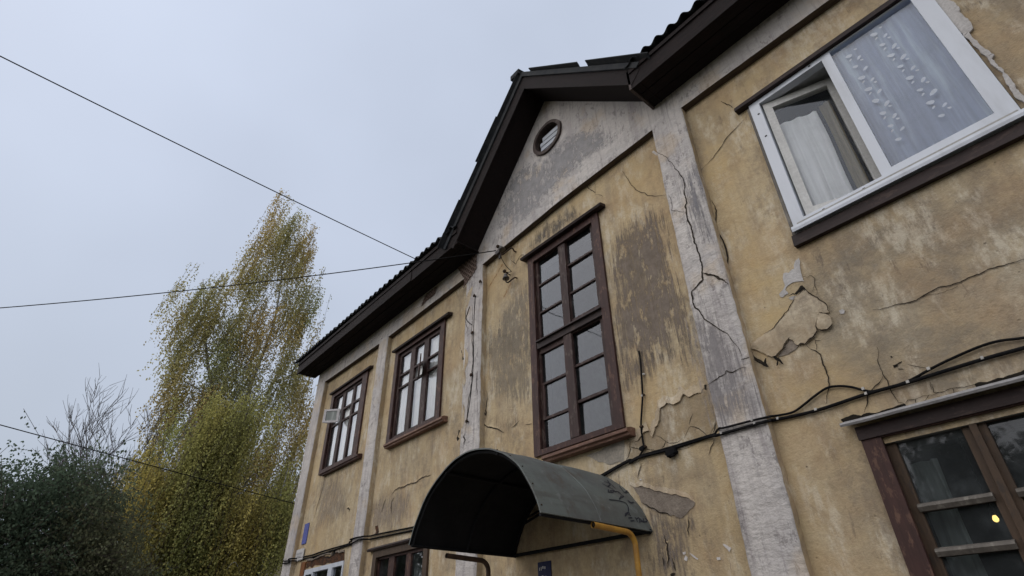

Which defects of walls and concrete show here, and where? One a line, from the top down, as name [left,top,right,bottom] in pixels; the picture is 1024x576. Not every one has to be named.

spalling [935,0,1024,103]
water stain [609,212,761,424]
crack [624,101,832,411]
spalling [778,339,798,357]
peeling [779,258,804,300]
crack [873,259,1023,310]
spalling [587,376,716,465]
spalling [628,479,695,518]